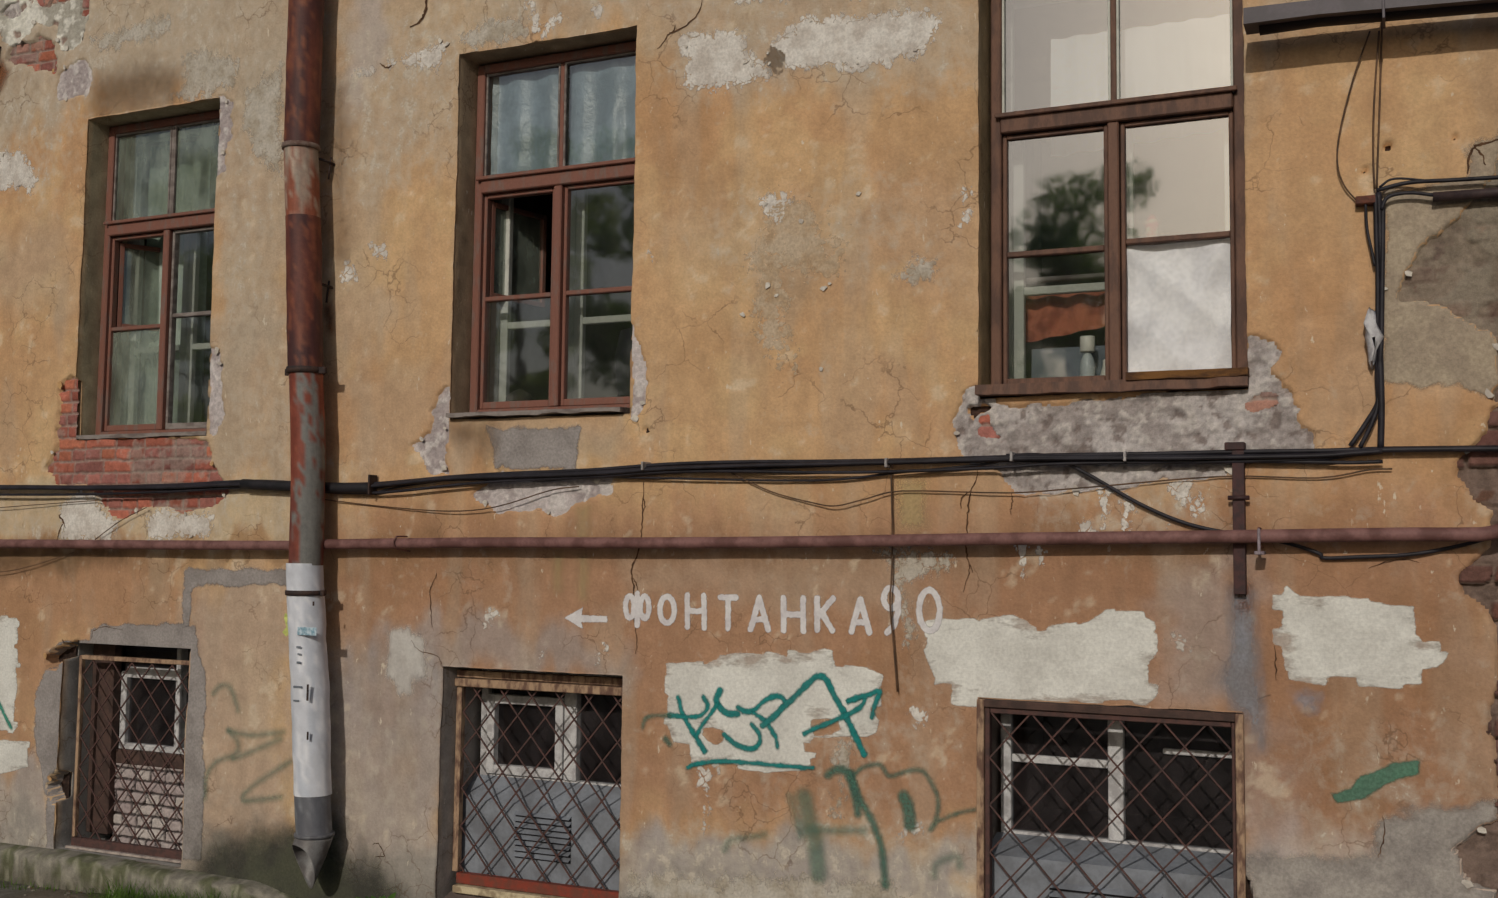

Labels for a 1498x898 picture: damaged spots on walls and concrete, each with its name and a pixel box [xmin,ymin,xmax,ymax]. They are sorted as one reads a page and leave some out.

flaking render [0,0,93,101]
peeling [675,0,942,94]
flaking render [1385,160,1498,350]
flaking render [48,347,229,540]
flaking render [952,335,1314,496]
flaking render [1457,388,1498,643]
flaking render [1456,680,1498,898]